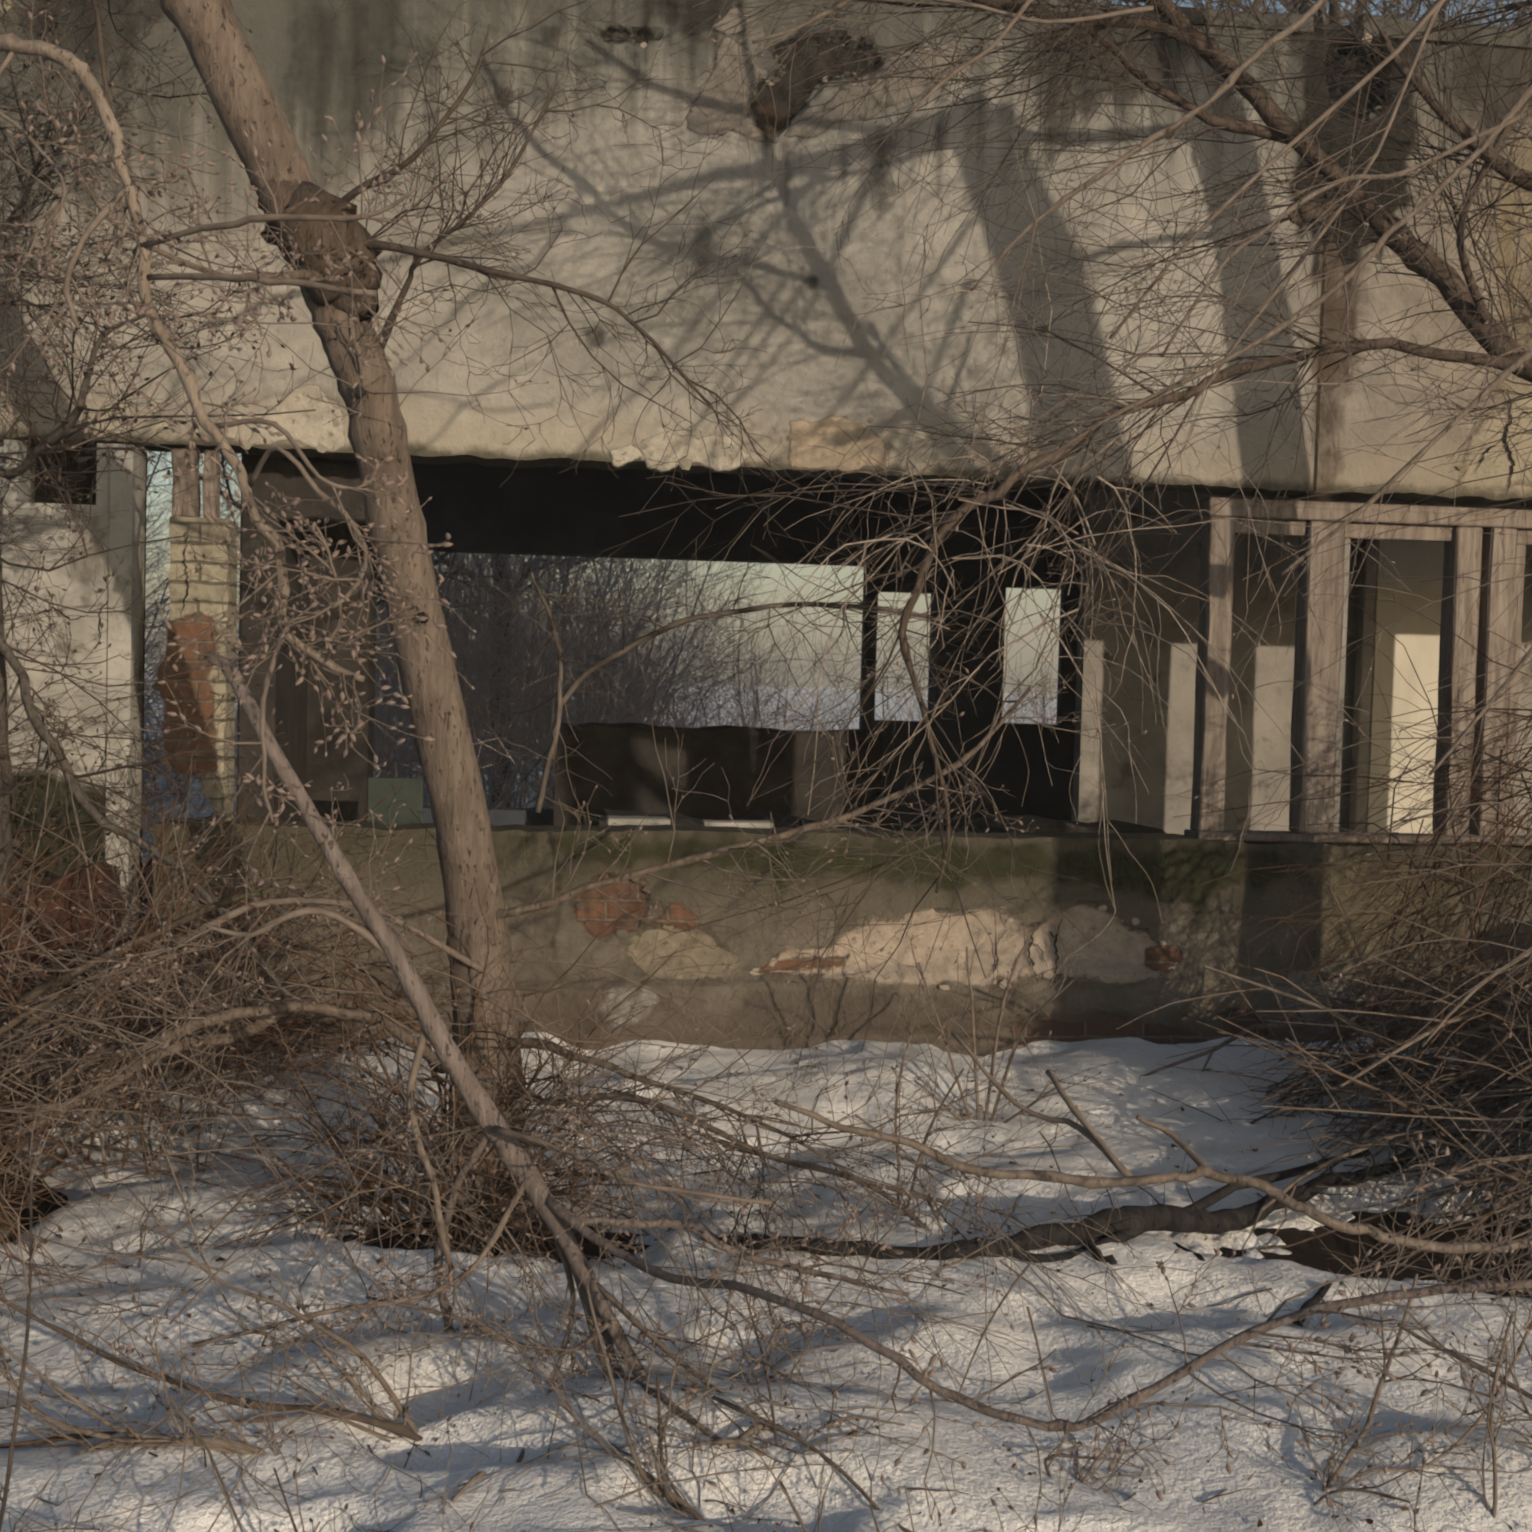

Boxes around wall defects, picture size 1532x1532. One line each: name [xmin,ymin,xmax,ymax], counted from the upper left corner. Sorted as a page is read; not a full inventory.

flaking render [686,6,961,143]
damp [1298,26,1420,214]
damp [1291,157,1384,275]
spalling [610,430,765,472]
flaking render [788,416,894,472]
spalling [152,611,217,779]
spalling [626,902,1184,990]